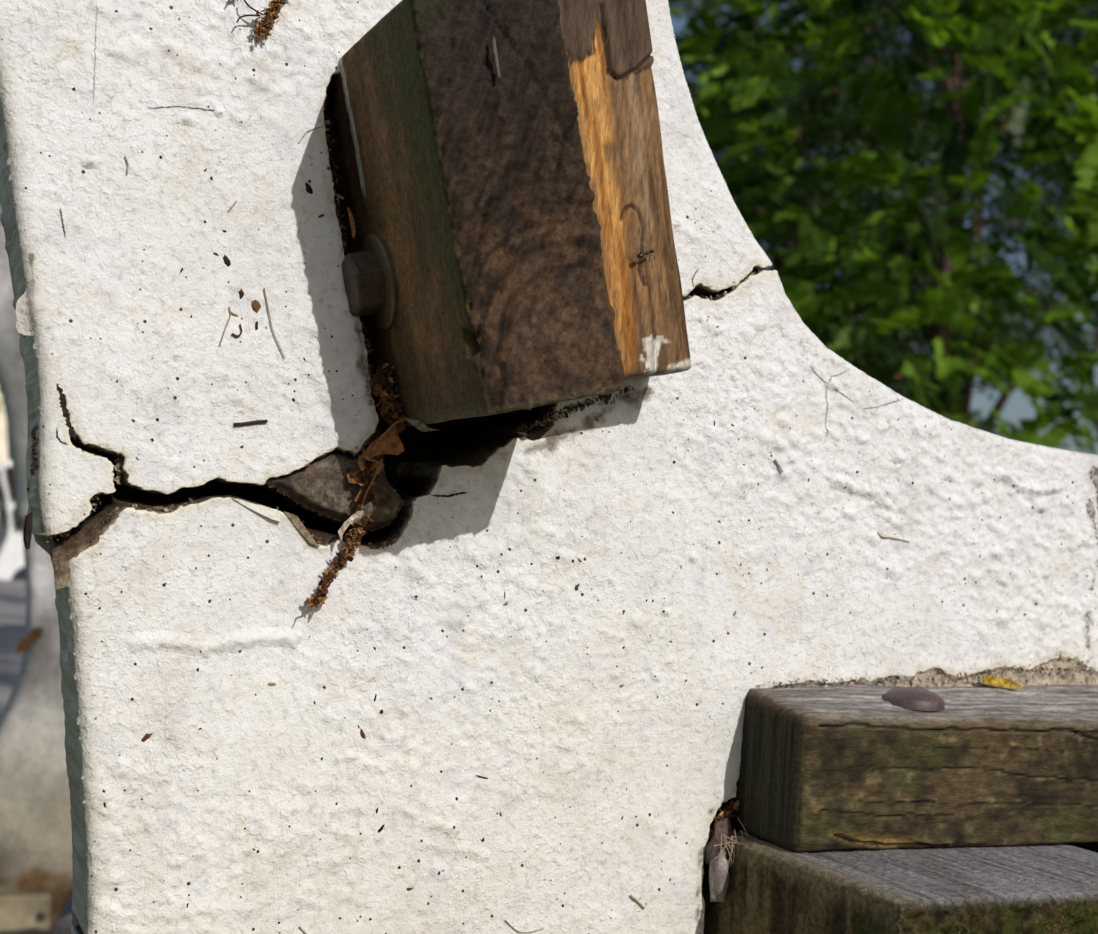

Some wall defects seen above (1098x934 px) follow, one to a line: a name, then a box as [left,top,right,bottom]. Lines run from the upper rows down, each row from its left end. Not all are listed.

crack [326,74,337,90]
crack [683,266,768,301]
crack [29,384,467,590]
spalling [772,655,1098,688]